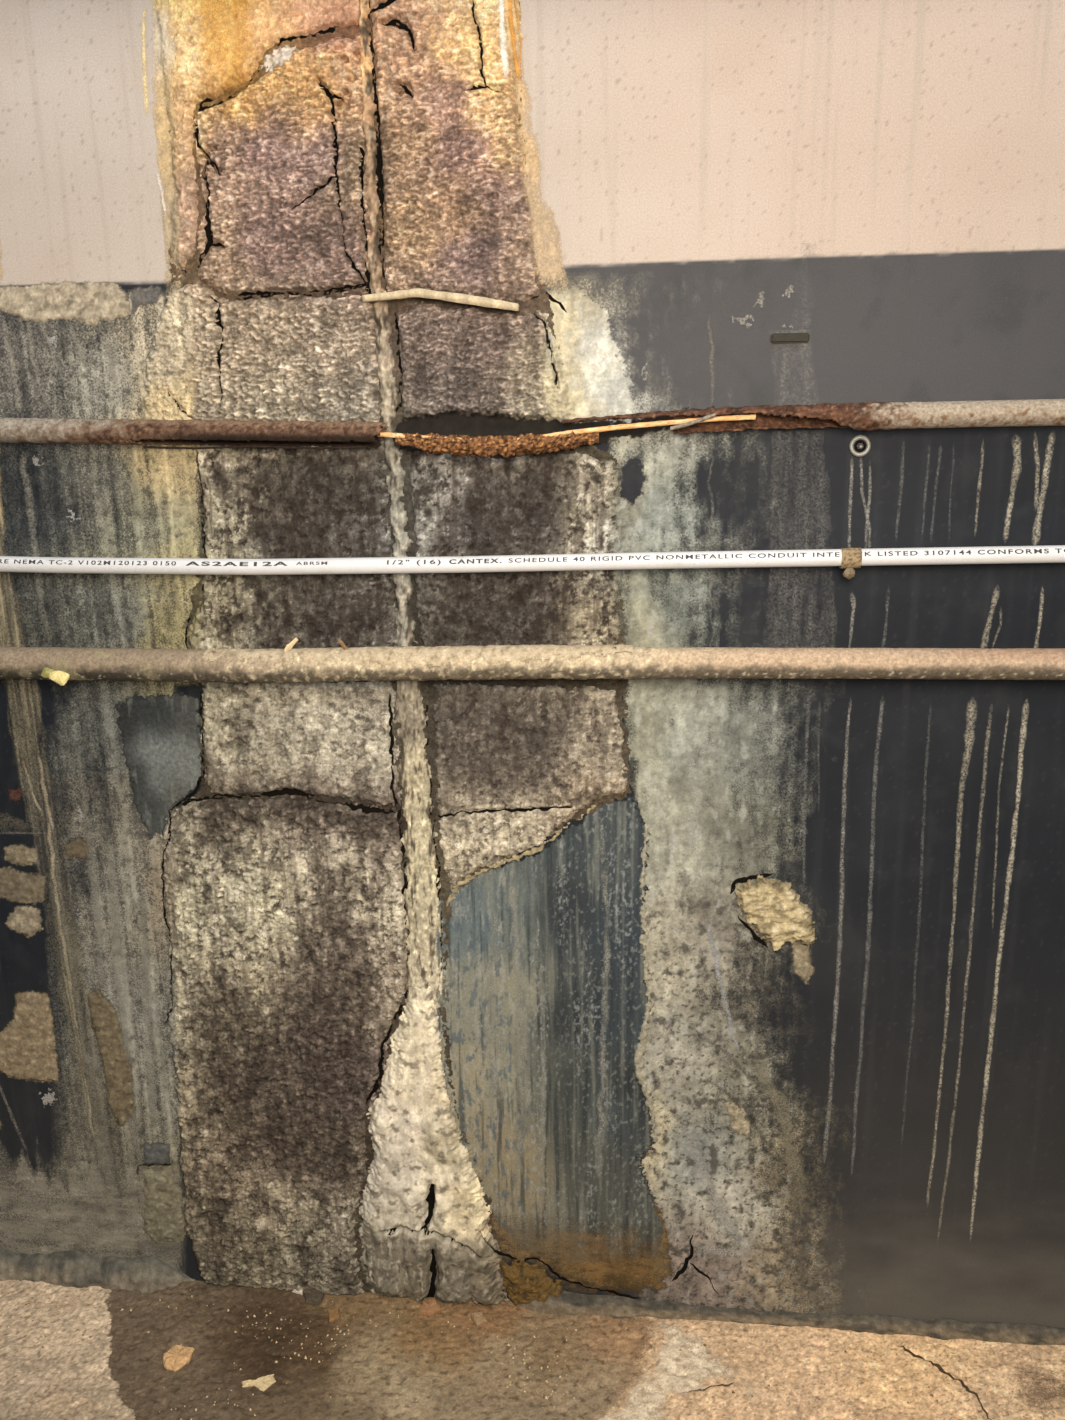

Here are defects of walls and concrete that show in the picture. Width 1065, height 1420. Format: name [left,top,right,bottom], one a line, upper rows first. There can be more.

crack [462,2,504,93]
corrosion [0,549,21,647]
spalling [0,991,58,1105]
corrosion [9,679,96,1130]
crack [168,0,415,649]
crack [161,688,573,1104]
leakage [0,0,840,1420]
peeling [436,796,664,1256]
spalling [730,873,817,984]
leakage [984,715,1027,1096]
leakage [1004,438,1053,539]
corrosion [489,1211,674,1296]